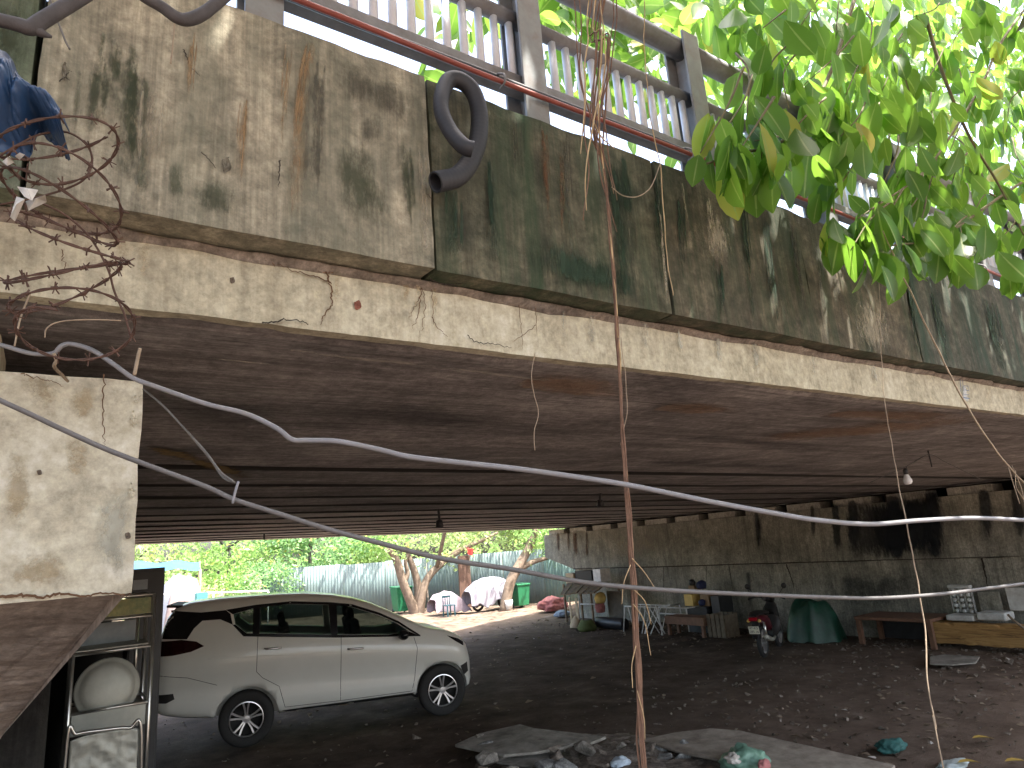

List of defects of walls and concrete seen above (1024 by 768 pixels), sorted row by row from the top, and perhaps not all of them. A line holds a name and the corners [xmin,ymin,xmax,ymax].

water stain [75,49,163,185]
water stain [403,146,428,247]
water stain [609,158,635,291]
water stain [654,181,687,289]
crack [262,264,333,325]
crack [411,273,537,349]
crack [100,374,108,444]
water stain [832,493,942,558]